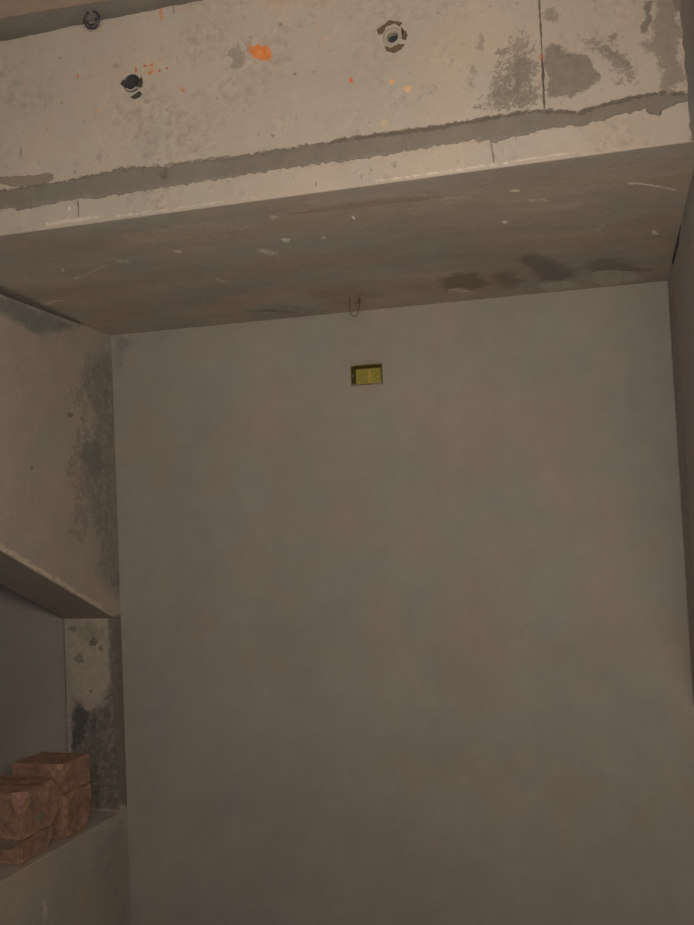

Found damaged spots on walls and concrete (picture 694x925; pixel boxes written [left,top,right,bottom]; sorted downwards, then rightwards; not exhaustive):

rust [247,44,271,60]
crack [537,0,545,109]